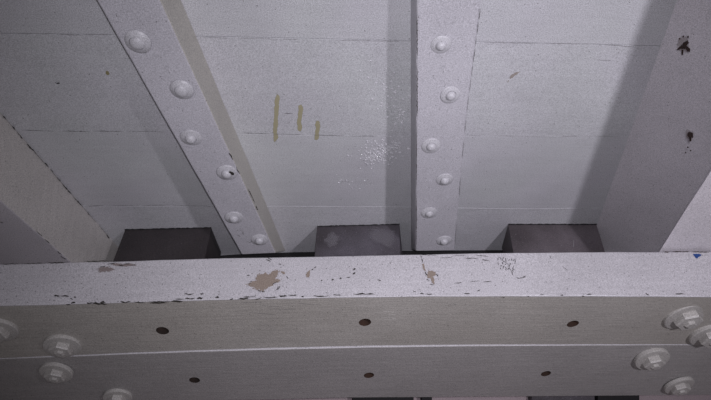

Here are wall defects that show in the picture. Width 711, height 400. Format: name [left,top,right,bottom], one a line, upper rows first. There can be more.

peeling [230,264,304,300]